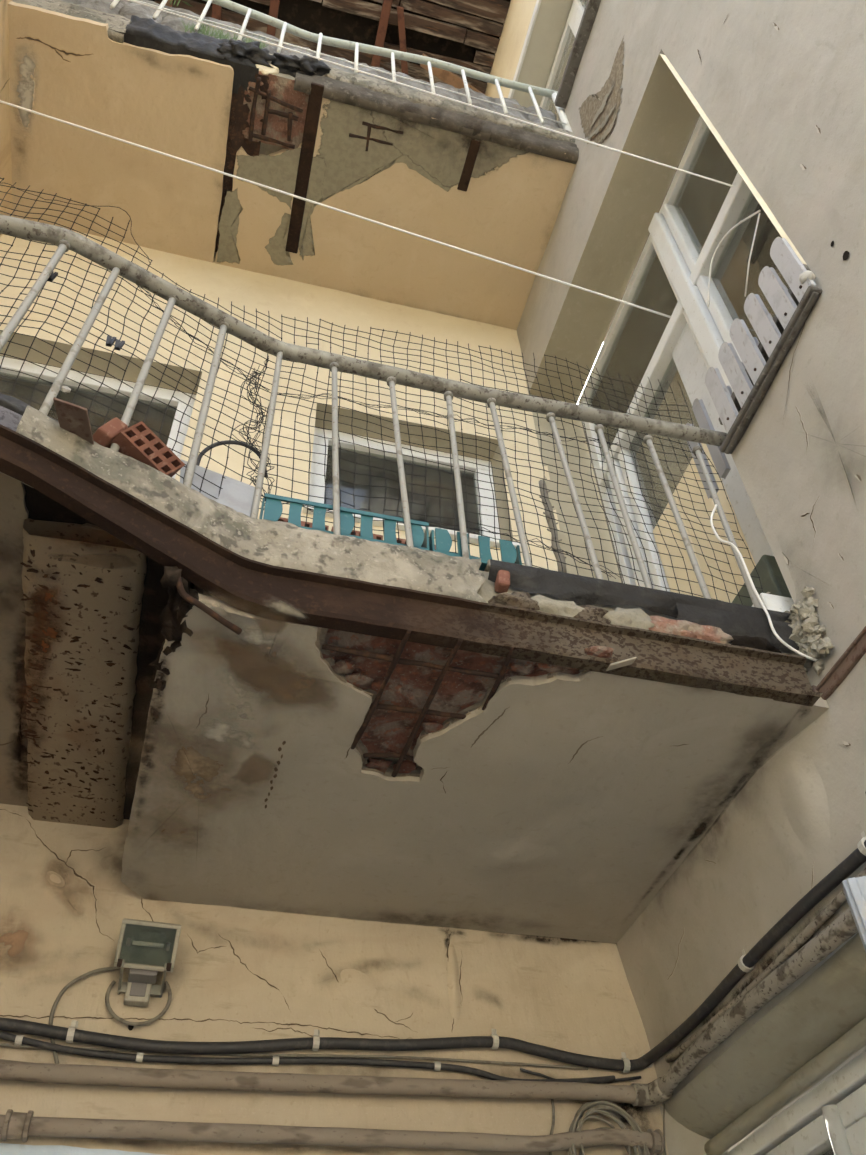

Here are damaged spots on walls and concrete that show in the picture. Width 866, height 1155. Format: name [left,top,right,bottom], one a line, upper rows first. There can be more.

crack [16,36,94,62]
peeling [12,0,528,265]
peeling [580,39,624,144]
rust [20,537,134,815]
spalling [315,627,589,777]
spalling [584,646,637,671]
crack [0,809,114,941]
damp [674,816,720,860]
crack [0,934,418,1039]
crack [445,932,462,1032]